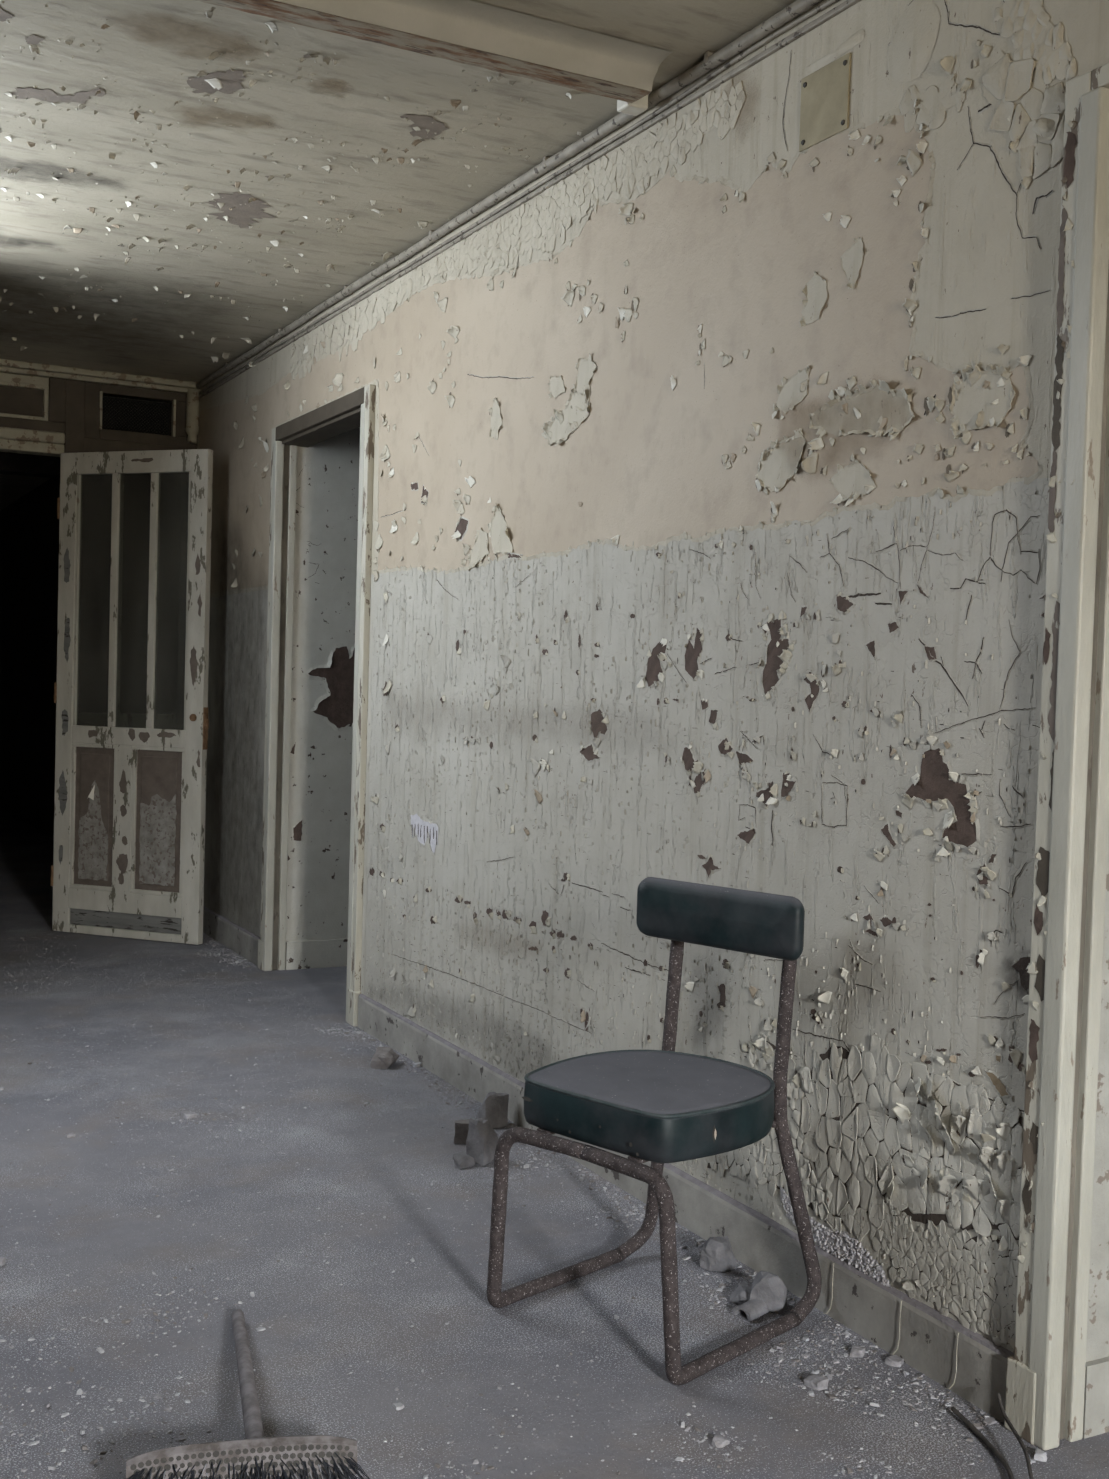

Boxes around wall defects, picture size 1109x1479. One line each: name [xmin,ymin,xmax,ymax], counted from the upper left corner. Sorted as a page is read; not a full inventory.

crack [907,0,1005,35]
peeling [0,21,552,322]
peeling [282,78,749,416]
crack [957,104,1053,249]
peeling [988,58,1084,543]
peeling [305,643,355,732]
crack [738,804,774,846]
crack [813,734,849,829]
crack [741,509,1042,738]
spalling [857,706,1012,901]
crack [961,773,1031,829]
spalling [702,986,1045,1349]